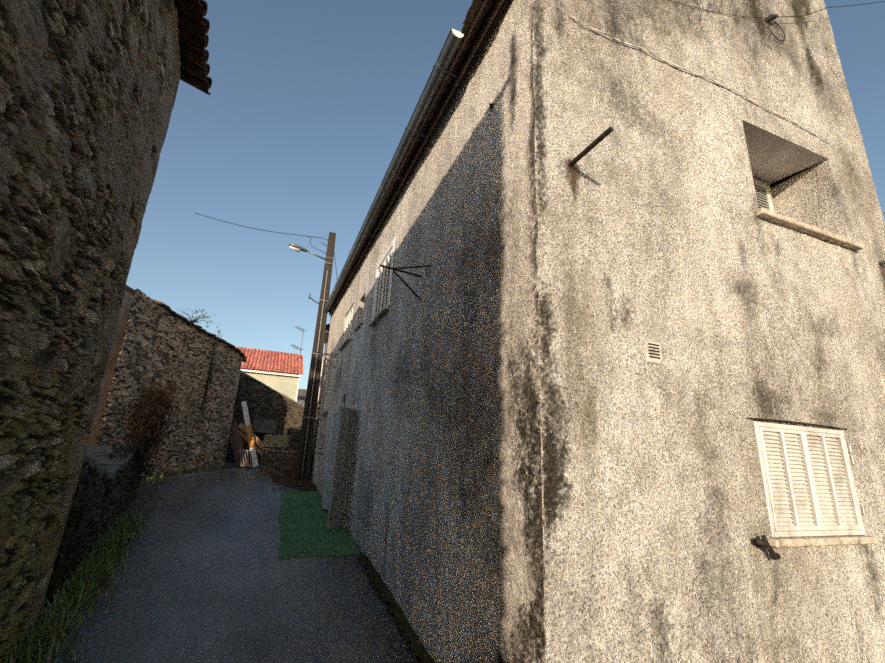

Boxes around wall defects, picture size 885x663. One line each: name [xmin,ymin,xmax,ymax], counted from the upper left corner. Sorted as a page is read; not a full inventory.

water stain [747,0,765,34]
water stain [790,0,811,36]
water stain [807,48,824,87]
water stain [527,2,547,270]
rust [567,158,580,199]
water stain [509,286,572,663]